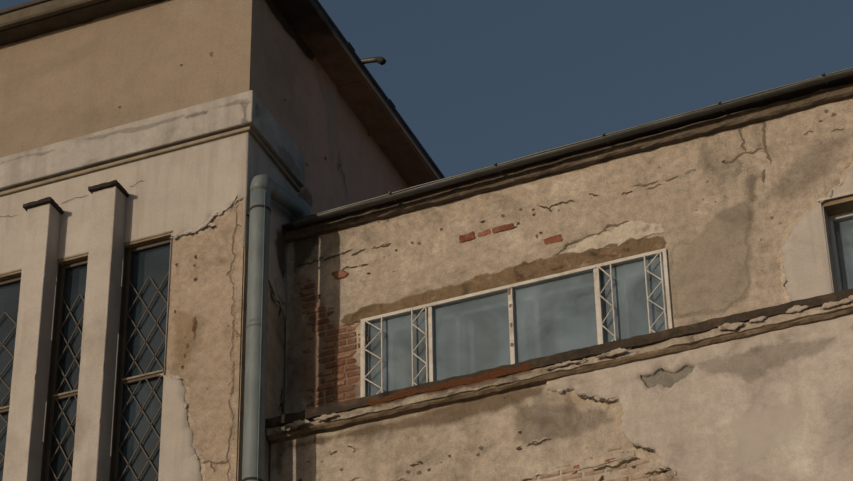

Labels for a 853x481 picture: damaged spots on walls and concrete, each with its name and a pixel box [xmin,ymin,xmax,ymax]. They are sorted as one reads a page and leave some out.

crack [168,196,242,481]
flaking render [165,196,248,481]
flaking render [264,97,853,481]
crack [538,191,598,212]
crack [622,169,696,194]
crack [722,120,771,183]